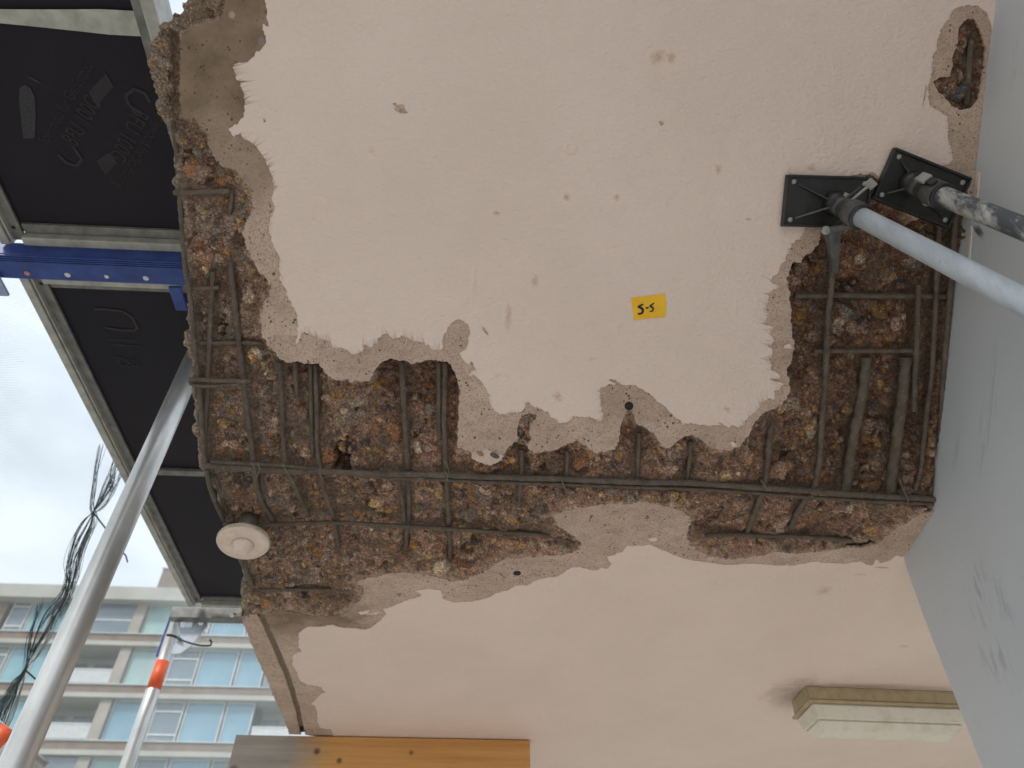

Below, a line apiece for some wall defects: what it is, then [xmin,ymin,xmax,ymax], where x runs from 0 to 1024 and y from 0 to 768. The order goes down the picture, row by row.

spalling [147,0,973,737]
peeling [922,5,992,198]